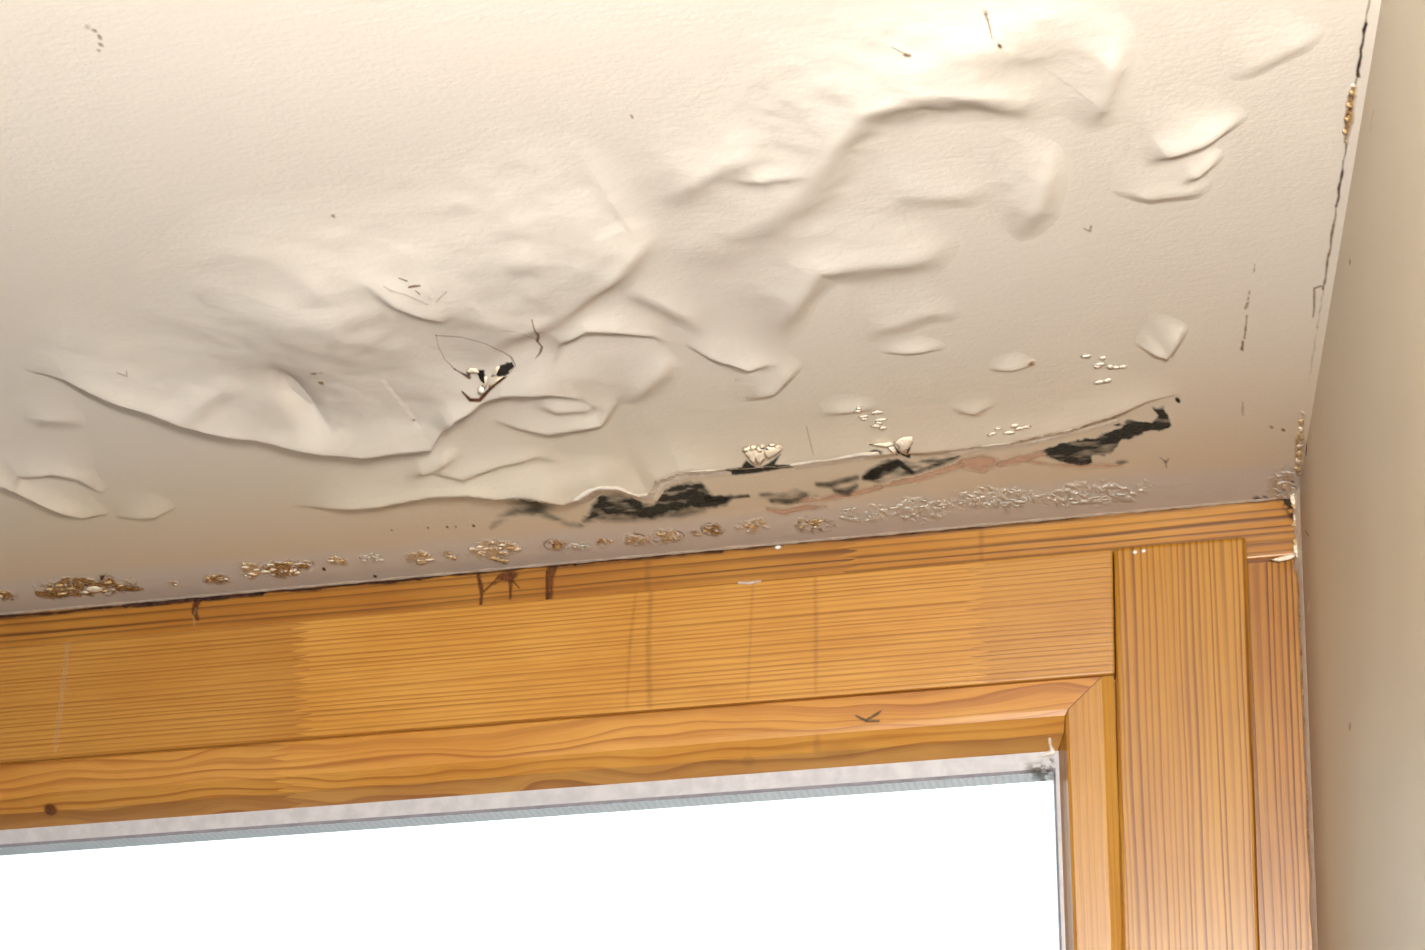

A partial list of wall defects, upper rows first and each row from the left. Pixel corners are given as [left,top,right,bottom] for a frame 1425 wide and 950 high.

peeling [290,354,1183,566]